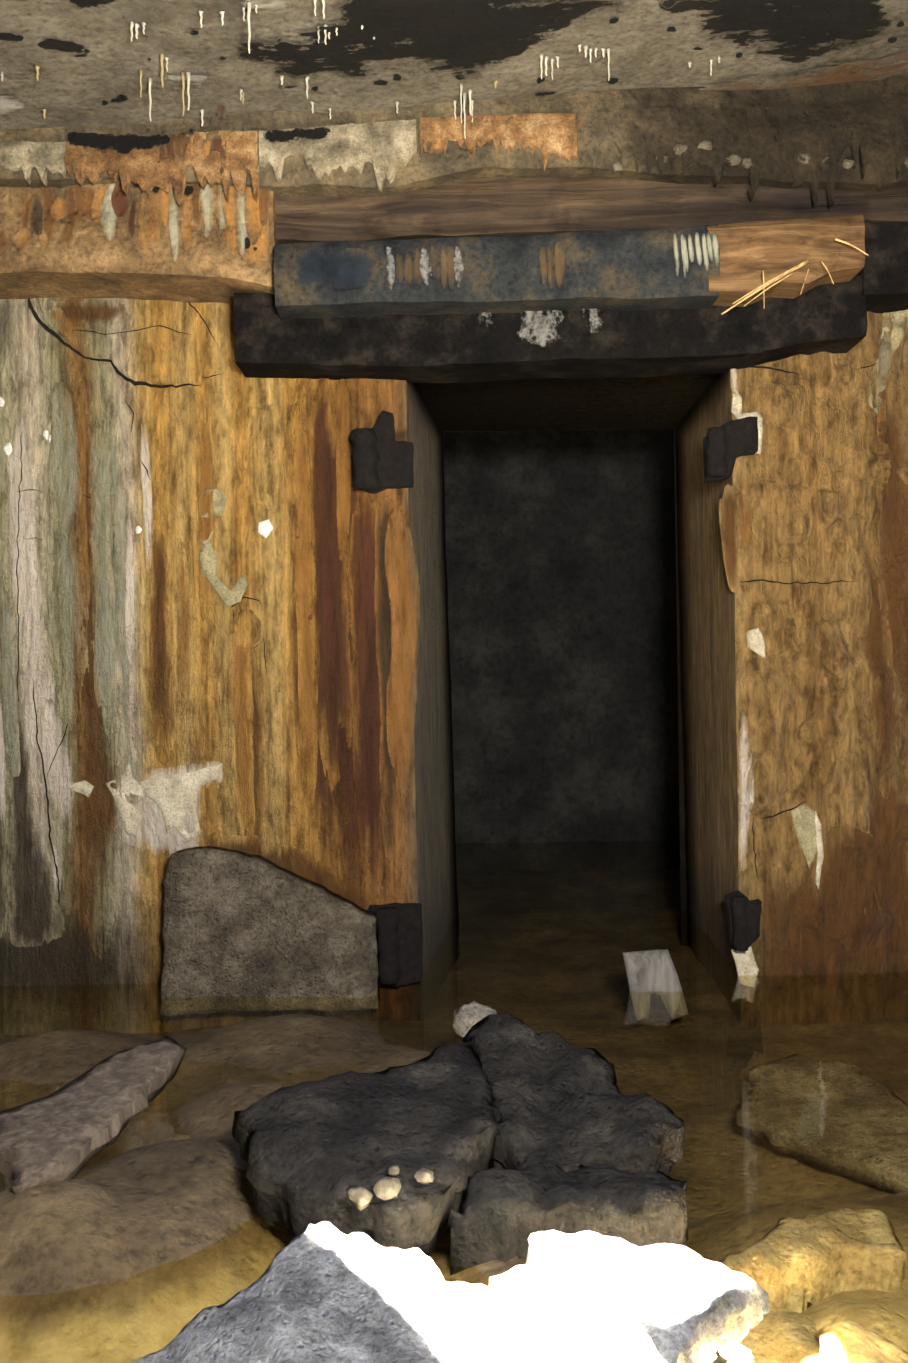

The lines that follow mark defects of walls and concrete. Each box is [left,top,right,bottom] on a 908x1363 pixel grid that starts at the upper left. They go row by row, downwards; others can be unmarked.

crack [28,298,220,430]
damp [730,369,739,395]
damp [872,313,895,414]
damp [736,710,755,873]